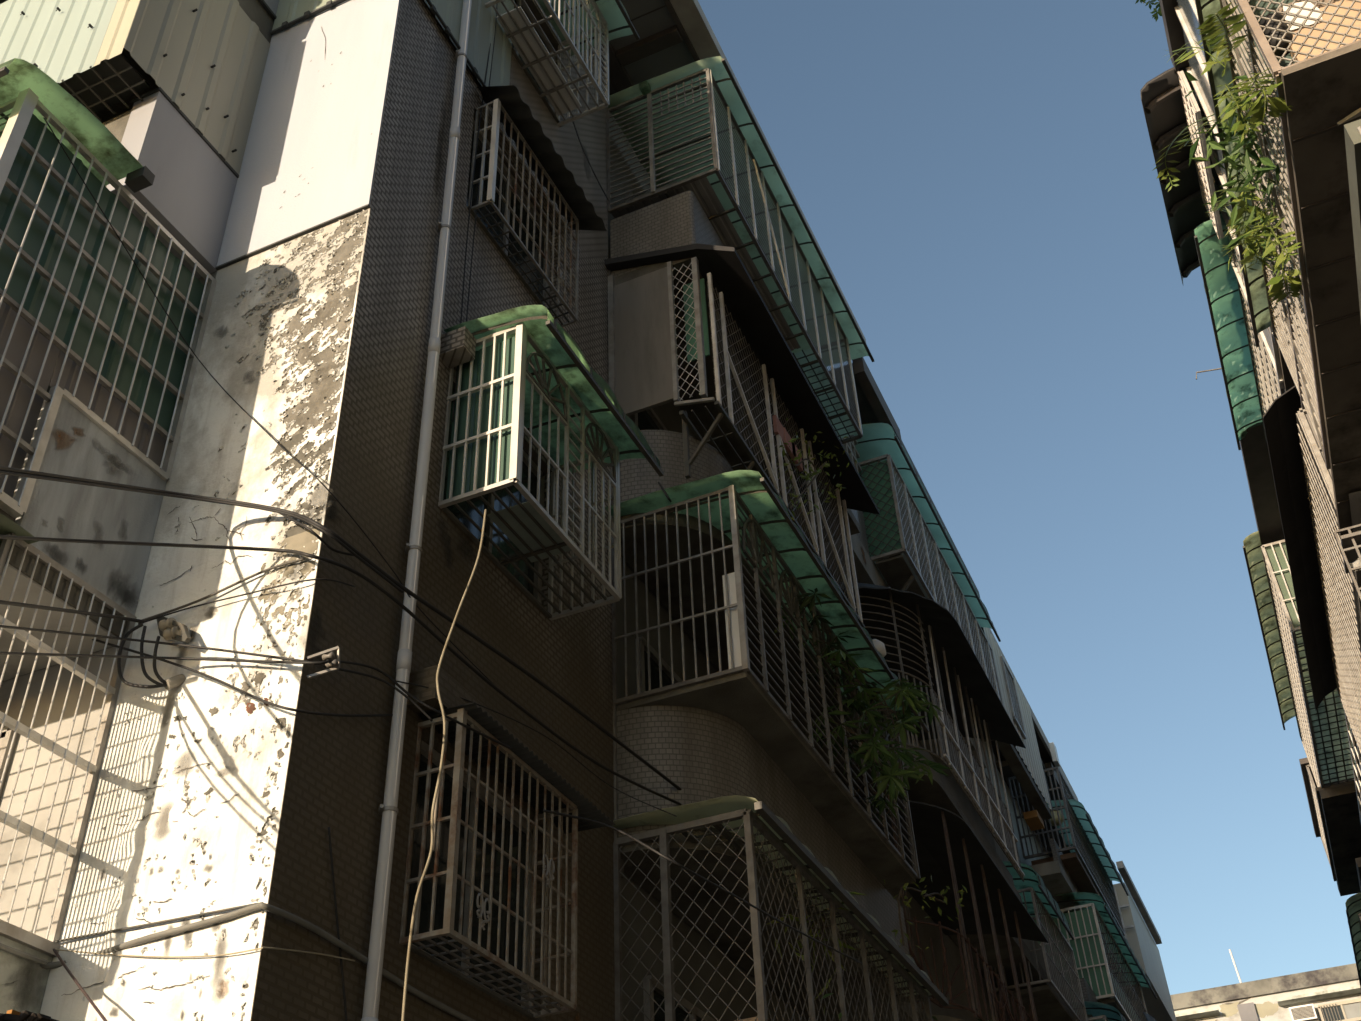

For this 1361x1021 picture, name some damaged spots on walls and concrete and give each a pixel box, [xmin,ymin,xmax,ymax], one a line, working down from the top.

peeling [128,210,368,951]
peeling [105,827,216,916]
peeling [224,967,248,1021]